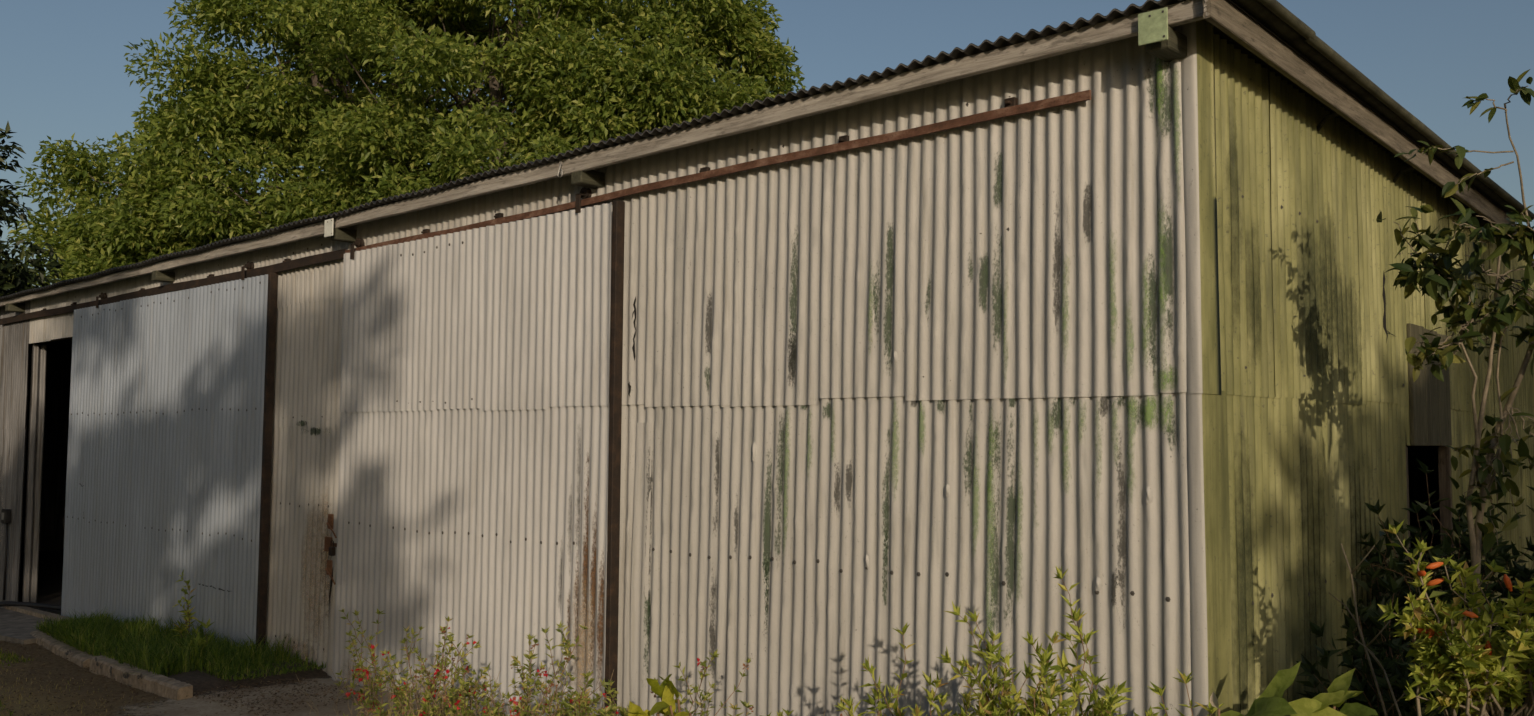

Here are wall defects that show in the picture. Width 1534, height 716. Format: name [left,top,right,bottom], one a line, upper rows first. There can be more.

leakage [1145,58,1180,161]
leakage [1109,211,1174,373]
leakage [1231,238,1261,345]
leakage [1298,237,1355,367]
rust [567,458,604,691]
leakage [882,418,899,604]
leakage [964,403,1021,627]
leakage [1033,411,1097,481]
leakage [1111,402,1136,606]
leakage [1236,481,1255,711]